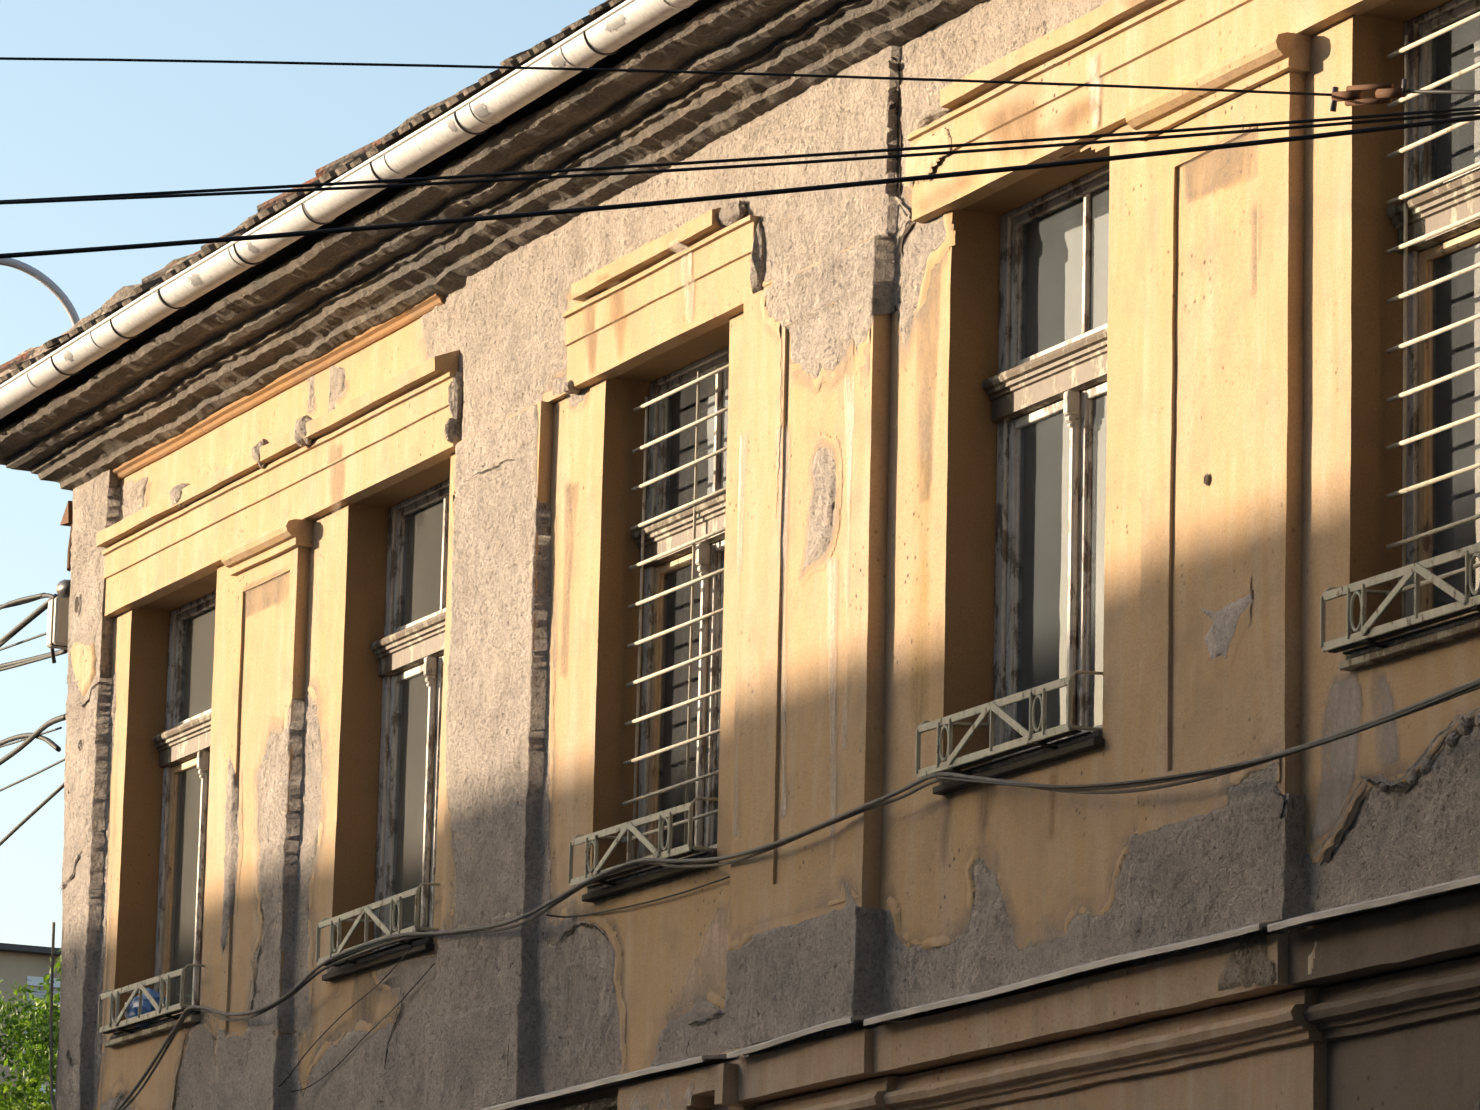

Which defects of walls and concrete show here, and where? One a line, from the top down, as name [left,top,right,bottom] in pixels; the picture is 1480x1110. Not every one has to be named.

peeling [1059,123,1137,158]
peeling [57,476,148,1110]
peeling [171,0,1111,1110]
peeling [650,706,1480,1067]